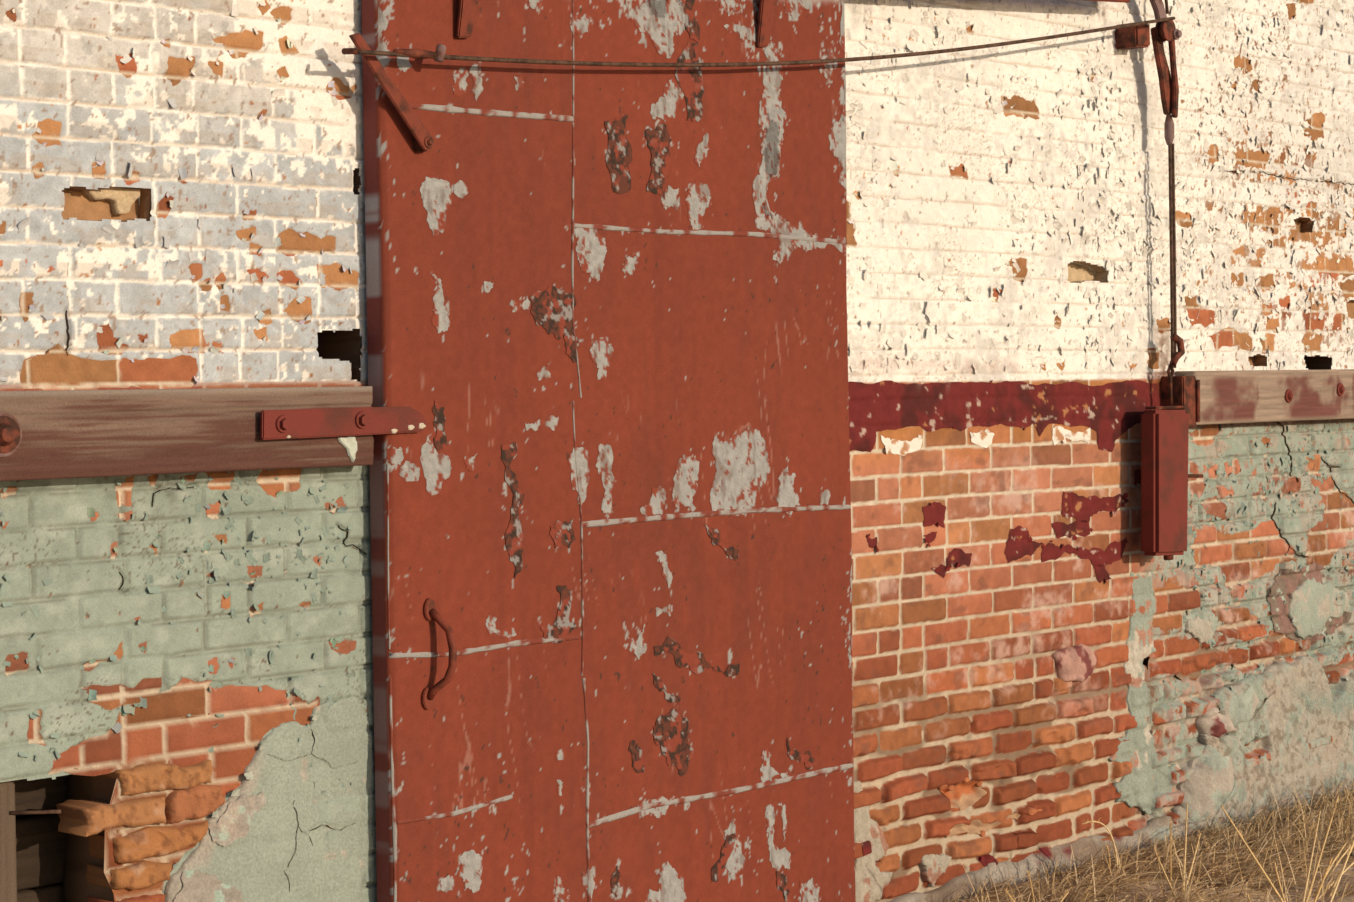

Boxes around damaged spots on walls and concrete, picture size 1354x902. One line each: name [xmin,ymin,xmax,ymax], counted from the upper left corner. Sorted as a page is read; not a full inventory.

spalling [62,150,174,248]
rust [605,114,671,199]
peeling [720,0,1354,456]
spalling [236,208,362,382]
peeling [0,324,223,390]
peeling [640,427,800,517]
peeling [1005,469,1141,583]
crack [1271,422,1354,558]
spalling [1108,425,1354,830]
spalling [18,632,376,902]
crack [270,729,356,769]
crack [284,800,354,892]